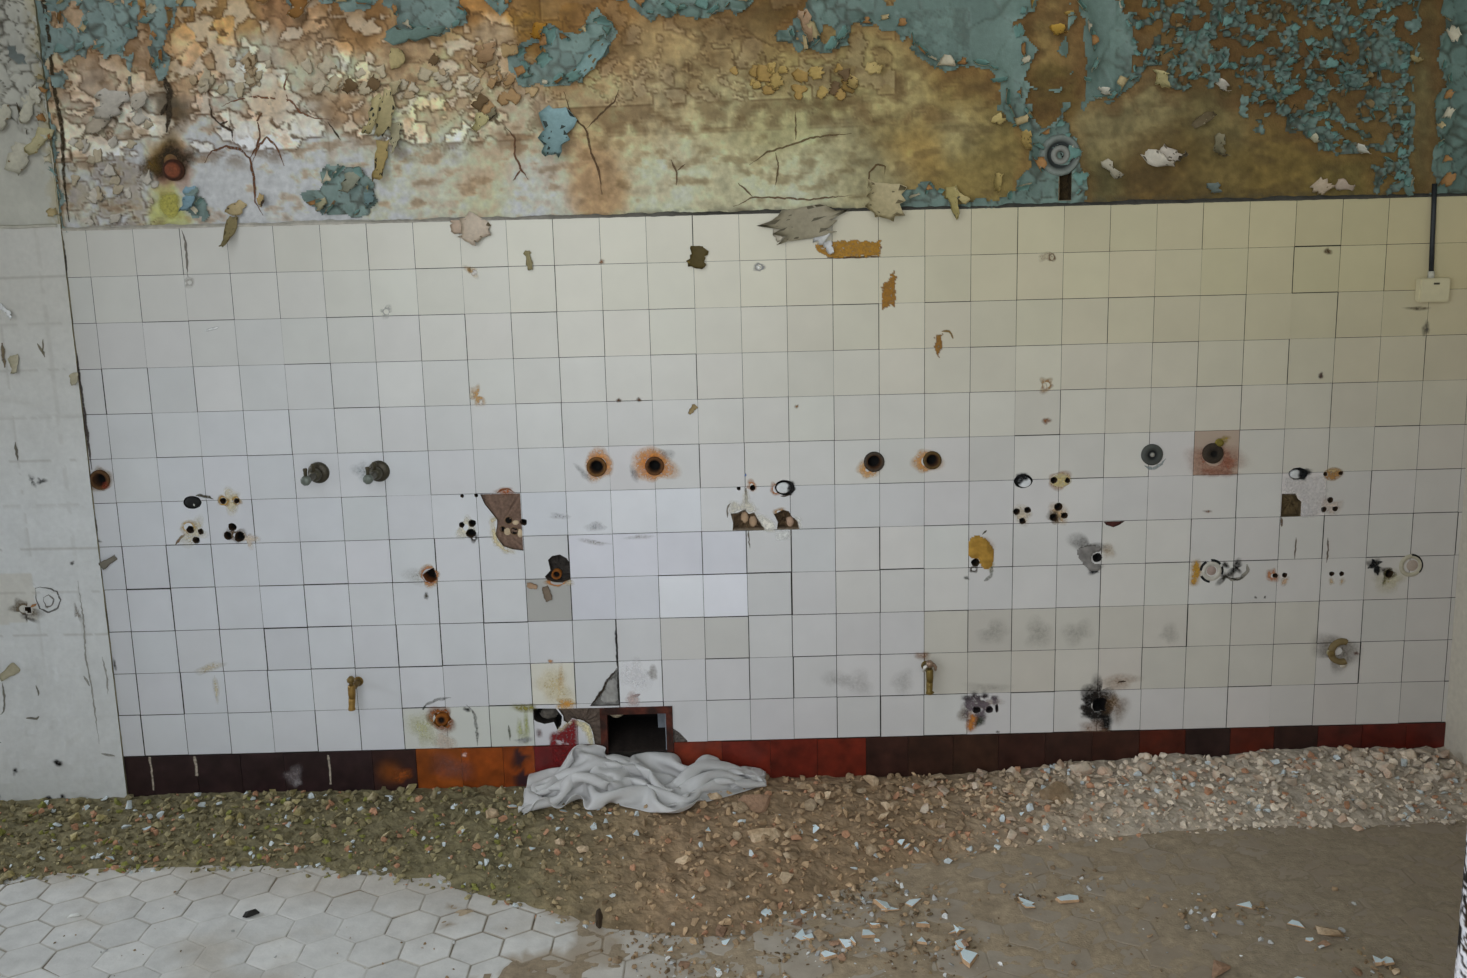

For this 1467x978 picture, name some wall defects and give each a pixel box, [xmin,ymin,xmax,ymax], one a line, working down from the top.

peeling [0,0,1462,247]
corrosion [587,450,612,479]
corrosion [636,449,673,480]
spalling [471,488,524,551]
spalling [533,628,620,745]